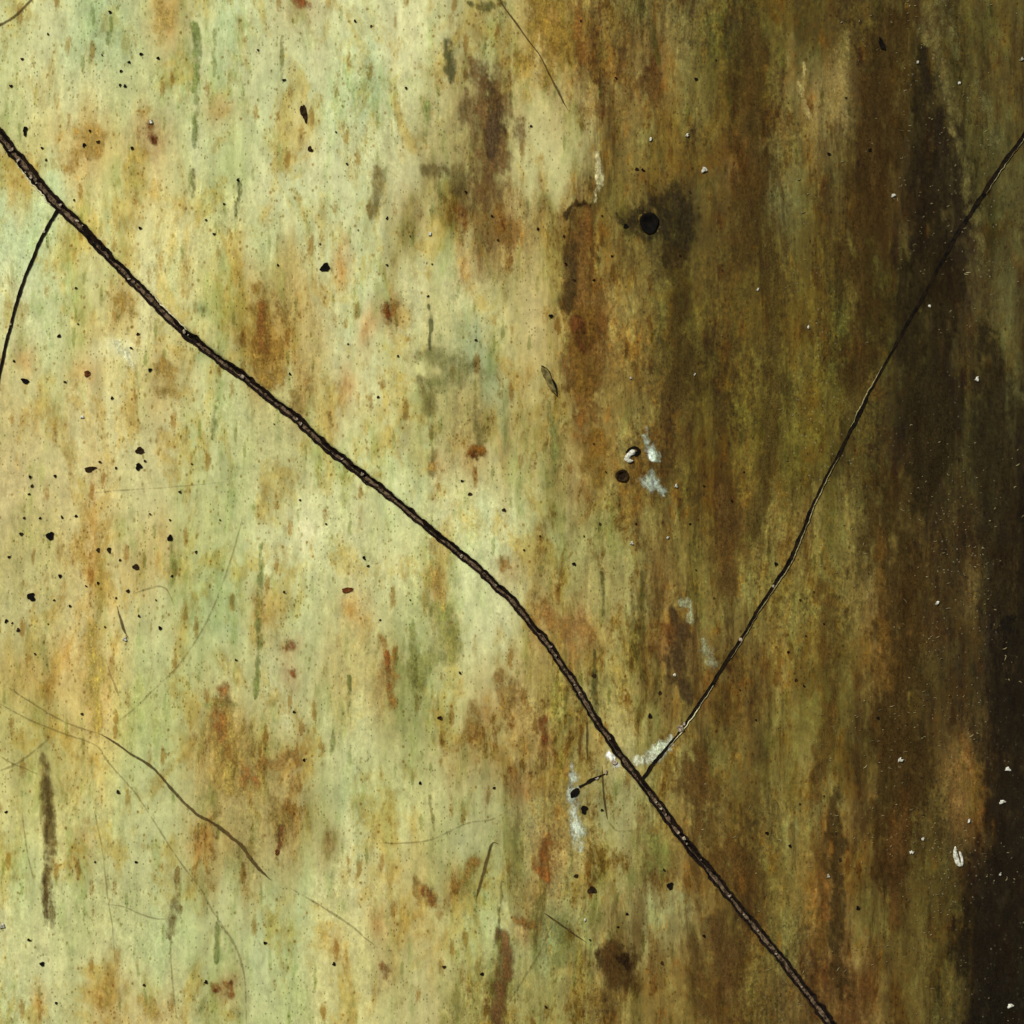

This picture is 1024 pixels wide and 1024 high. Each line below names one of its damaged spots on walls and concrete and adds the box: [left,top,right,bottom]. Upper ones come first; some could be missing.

crack [0,127,837,1024]
water stain [616,180,700,401]
water stain [810,584,853,1000]
crack [642,132,1024,779]
water stain [839,7,976,928]
water stain [947,319,1024,1024]